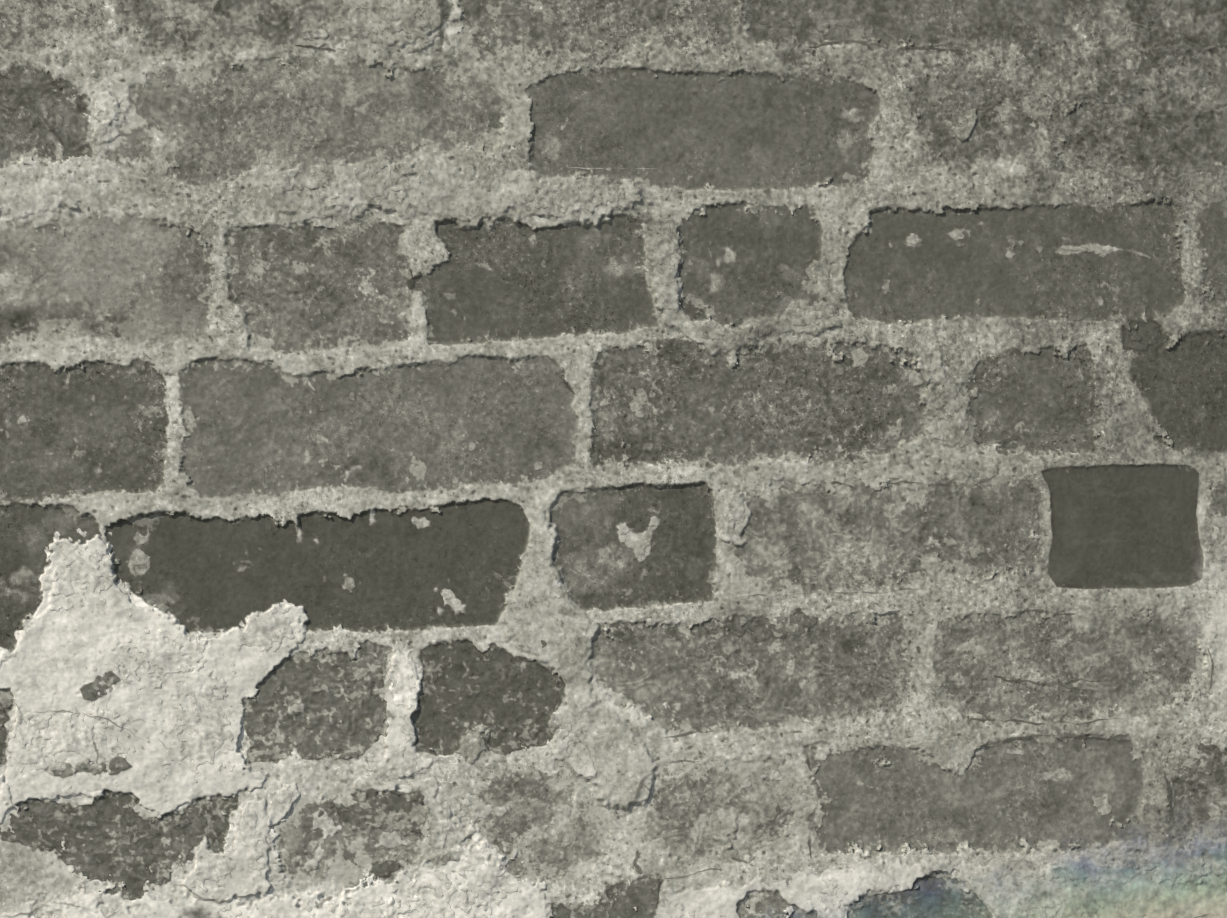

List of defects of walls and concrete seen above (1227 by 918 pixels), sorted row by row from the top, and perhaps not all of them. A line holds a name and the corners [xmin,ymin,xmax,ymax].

peeling [0,528,1227,918]